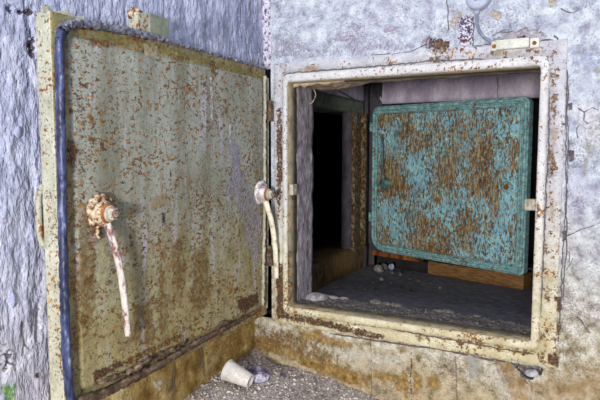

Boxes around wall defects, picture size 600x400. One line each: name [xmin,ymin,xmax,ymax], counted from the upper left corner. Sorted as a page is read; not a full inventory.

rust [88,38,114,51]
rust [429,38,452,63]
rust [549,69,560,117]
crack [559,70,599,330]
rust [372,250,428,273]
rust [237,293,259,313]
rust [275,252,384,339]
rust [544,288,562,341]
rust [93,333,182,381]
water stain [255,326,440,398]
rust [495,345,560,368]